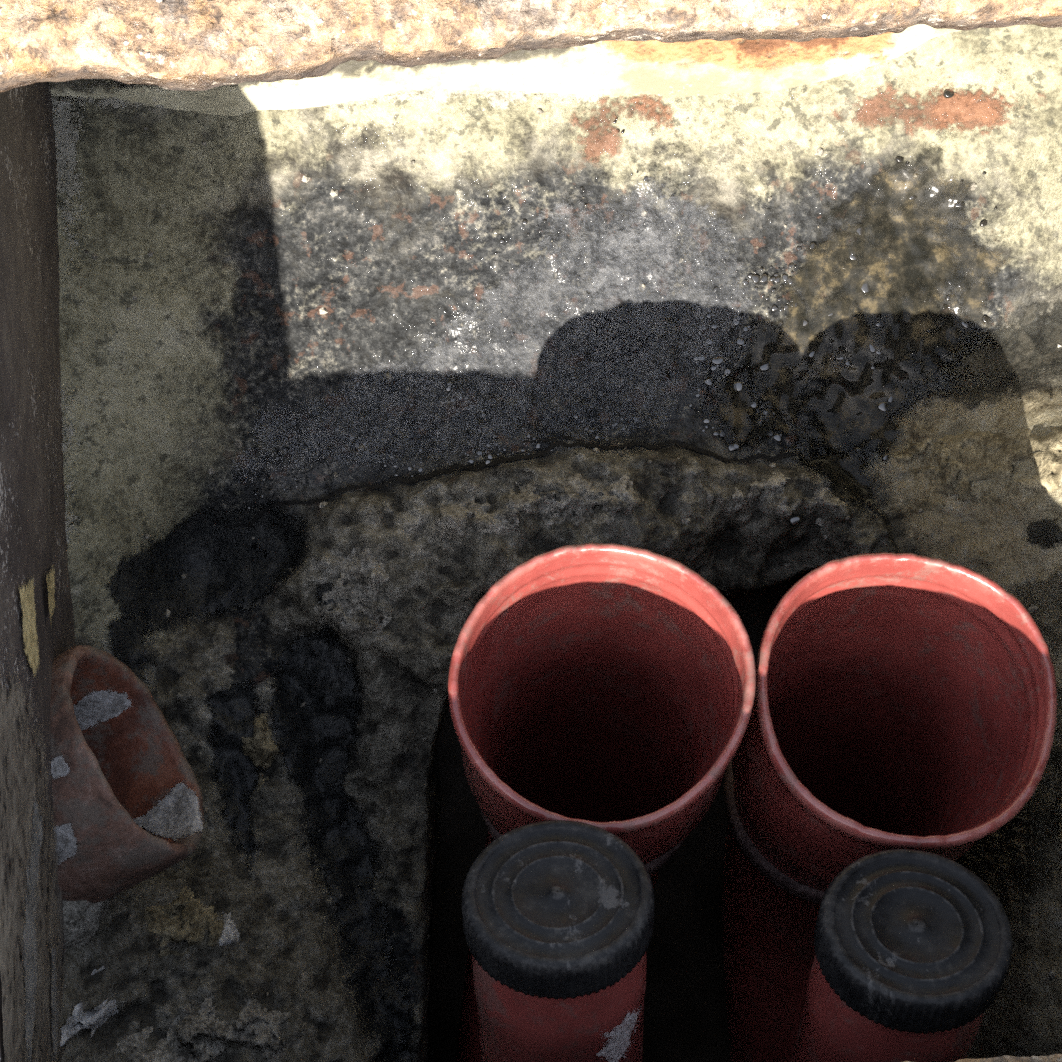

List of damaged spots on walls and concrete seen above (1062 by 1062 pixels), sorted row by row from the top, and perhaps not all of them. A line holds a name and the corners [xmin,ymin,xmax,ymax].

water stain [714,149,1062,510]
crack [226,436,883,528]
water stain [108,499,307,685]
water stain [316,583,348,611]
water stain [208,624,416,1062]